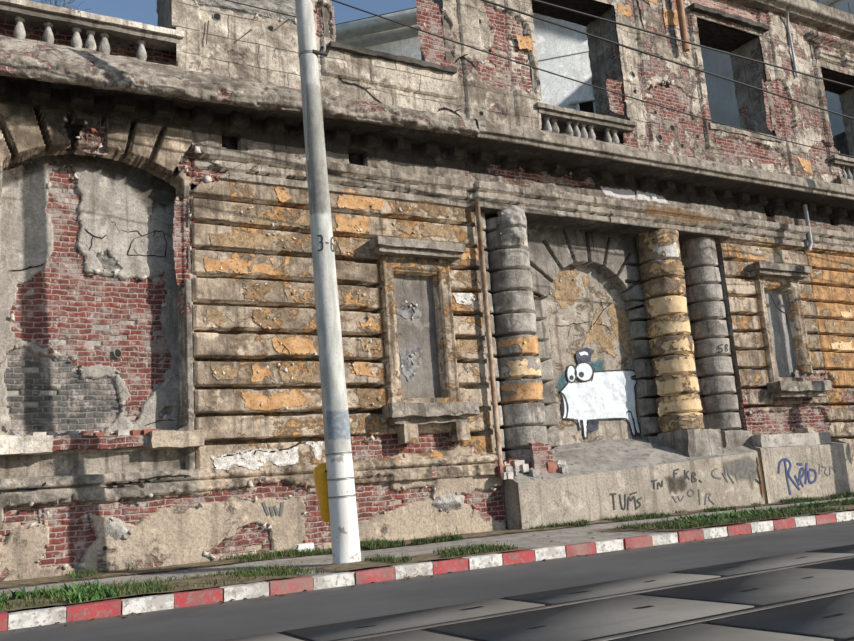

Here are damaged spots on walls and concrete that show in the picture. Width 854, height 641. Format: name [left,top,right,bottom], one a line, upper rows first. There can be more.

spalling [185,0,297,32]
spalling [416,0,455,67]
spalling [476,3,538,93]
crack [338,75,381,103]
spalling [606,71,693,141]
spalling [713,78,844,178]
spalling [177,146,225,185]
crack [85,229,167,257]
spalling [4,166,317,436]
peeling [820,310,854,353]
spalling [0,441,331,569]